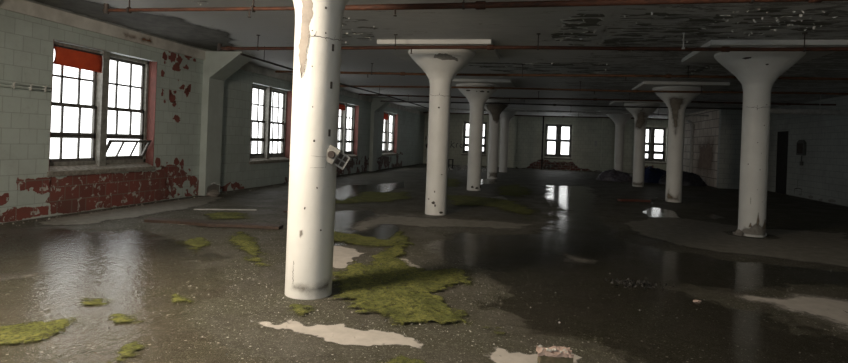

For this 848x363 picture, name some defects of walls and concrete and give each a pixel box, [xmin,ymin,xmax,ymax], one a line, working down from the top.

peeling [298,0,315,79]
peeling [551,7,843,52]
peeling [161,51,196,123]
water stain [670,97,683,135]
peeling [336,152,403,176]
spalling [525,159,600,172]
peeling [0,157,244,223]